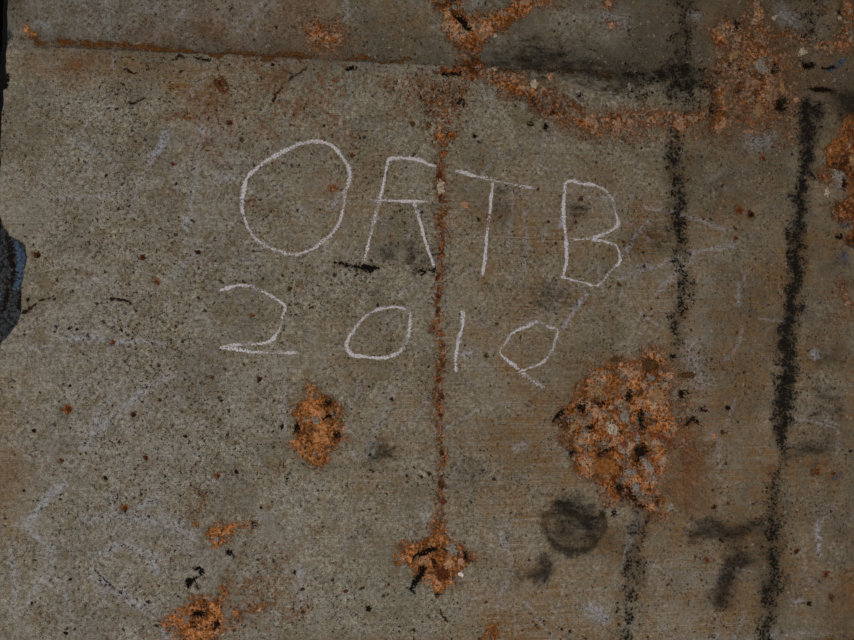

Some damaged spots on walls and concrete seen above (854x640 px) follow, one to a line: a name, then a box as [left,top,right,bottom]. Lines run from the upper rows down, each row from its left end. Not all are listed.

rust [432,58,634,79]
water stain [487,0,726,349]
water stain [689,90,854,640]
rust [289,377,353,475]
rust [157,551,296,640]
rust [389,515,483,600]
water stain [514,555,552,583]
water stain [541,490,652,640]